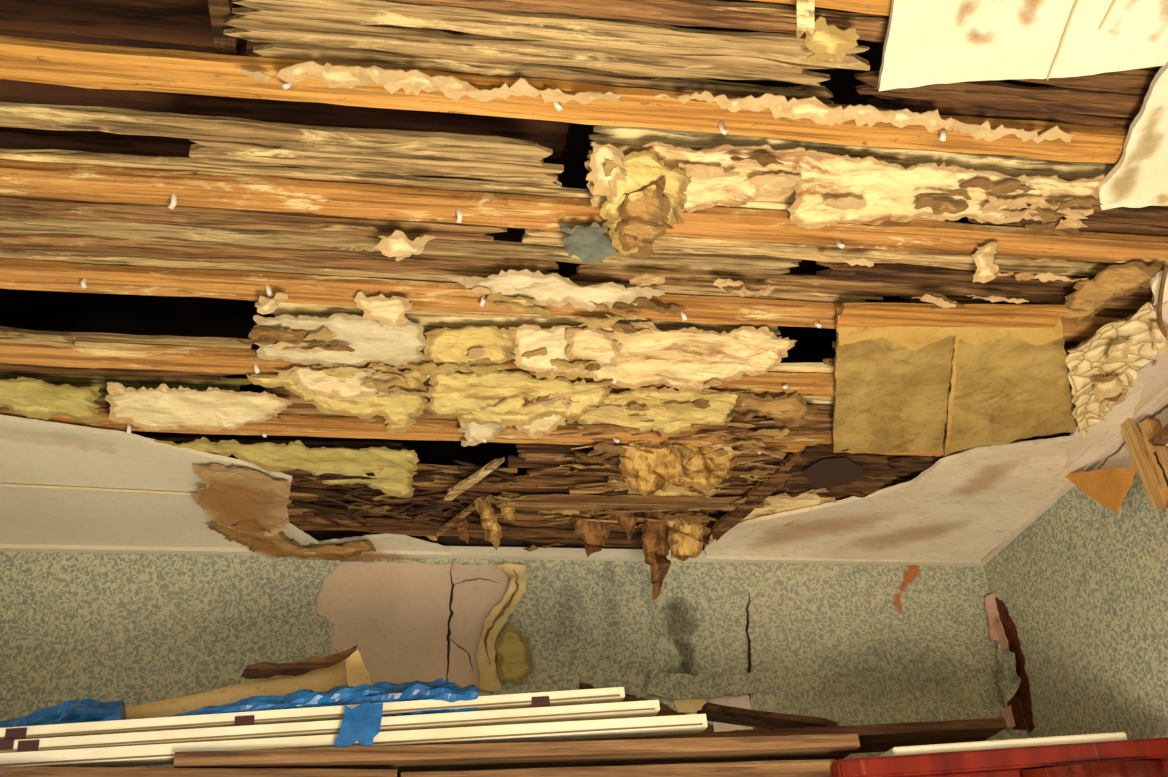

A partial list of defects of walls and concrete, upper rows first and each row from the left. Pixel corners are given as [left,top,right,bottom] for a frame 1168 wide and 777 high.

water stain [1024,0,1040,25]
peeling [559,141,1105,263]
peeling [1065,302,1168,441]
flaking render [1090,440,1134,471]
flaking render [316,561,511,696]
crack [446,563,497,681]
crack [744,592,752,704]
flaking render [984,593,1035,732]